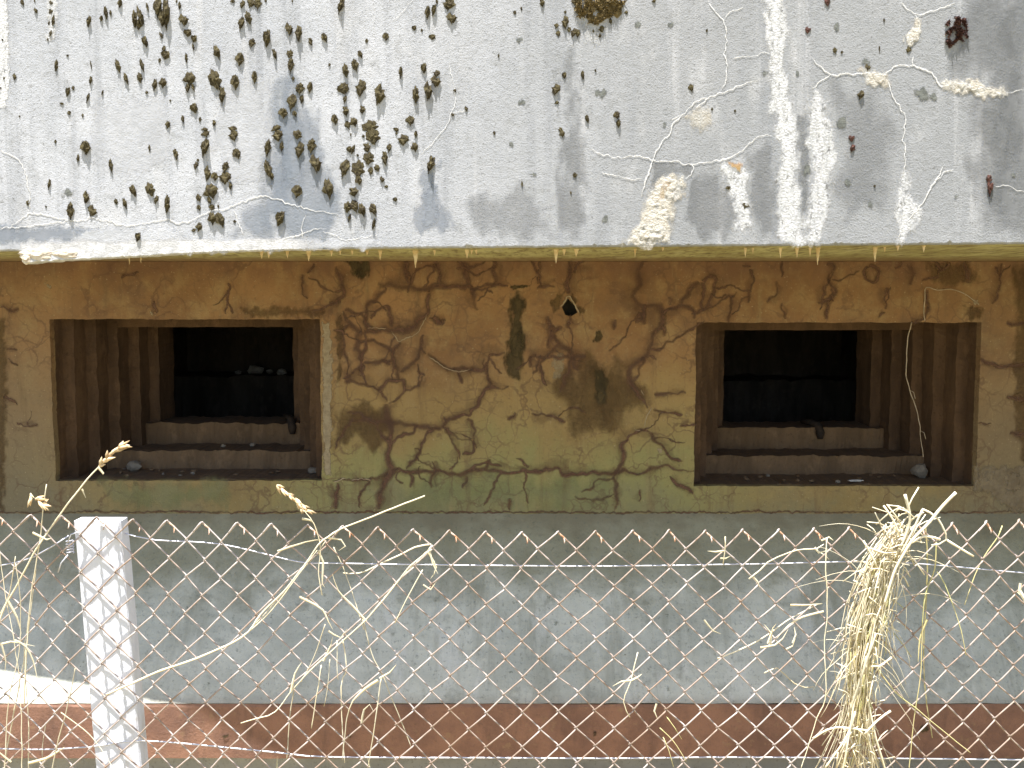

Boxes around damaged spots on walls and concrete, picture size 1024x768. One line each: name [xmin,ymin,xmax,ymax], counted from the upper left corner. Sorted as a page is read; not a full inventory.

crack [901,2,954,18]
damp [92,98,166,170]
damp [217,77,381,279]
damp [628,162,689,250]
crack [592,1,771,196]
damp [762,0,838,246]
crack [813,56,943,171]
damp [894,171,923,243]
crack [898,167,952,238]
damp [503,285,528,380]
spalling [561,296,579,316]
crack [73,261,1017,515]